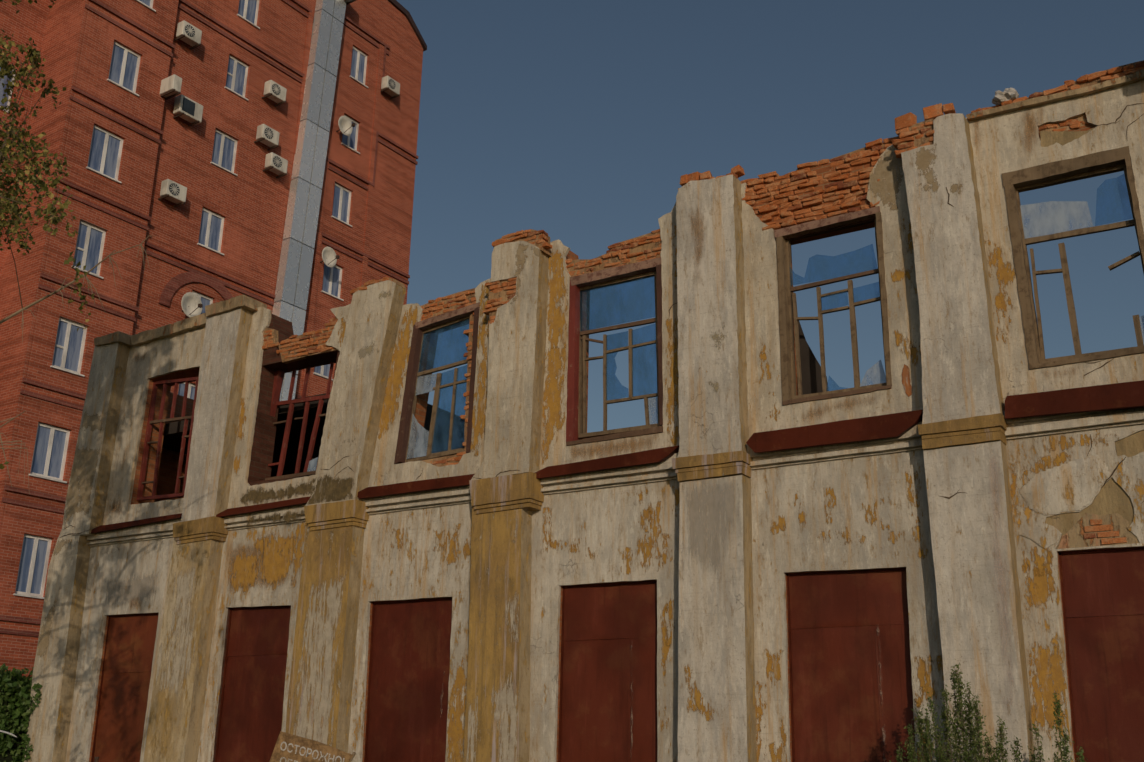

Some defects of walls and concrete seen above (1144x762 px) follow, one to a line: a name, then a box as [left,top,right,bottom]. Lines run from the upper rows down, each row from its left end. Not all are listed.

peeling [1038,113,1094,147]
crack [1098,103,1144,134]
spalling [709,118,962,253]
peeling [985,240,1015,343]
peeling [894,330,921,397]
peeling [1010,430,1144,511]
peeling [228,523,306,592]
peeling [621,486,680,574]
spalling [1021,478,1140,609]
peeling [684,664,714,721]
peeling [913,655,944,708]
peeling [1029,642,1070,738]